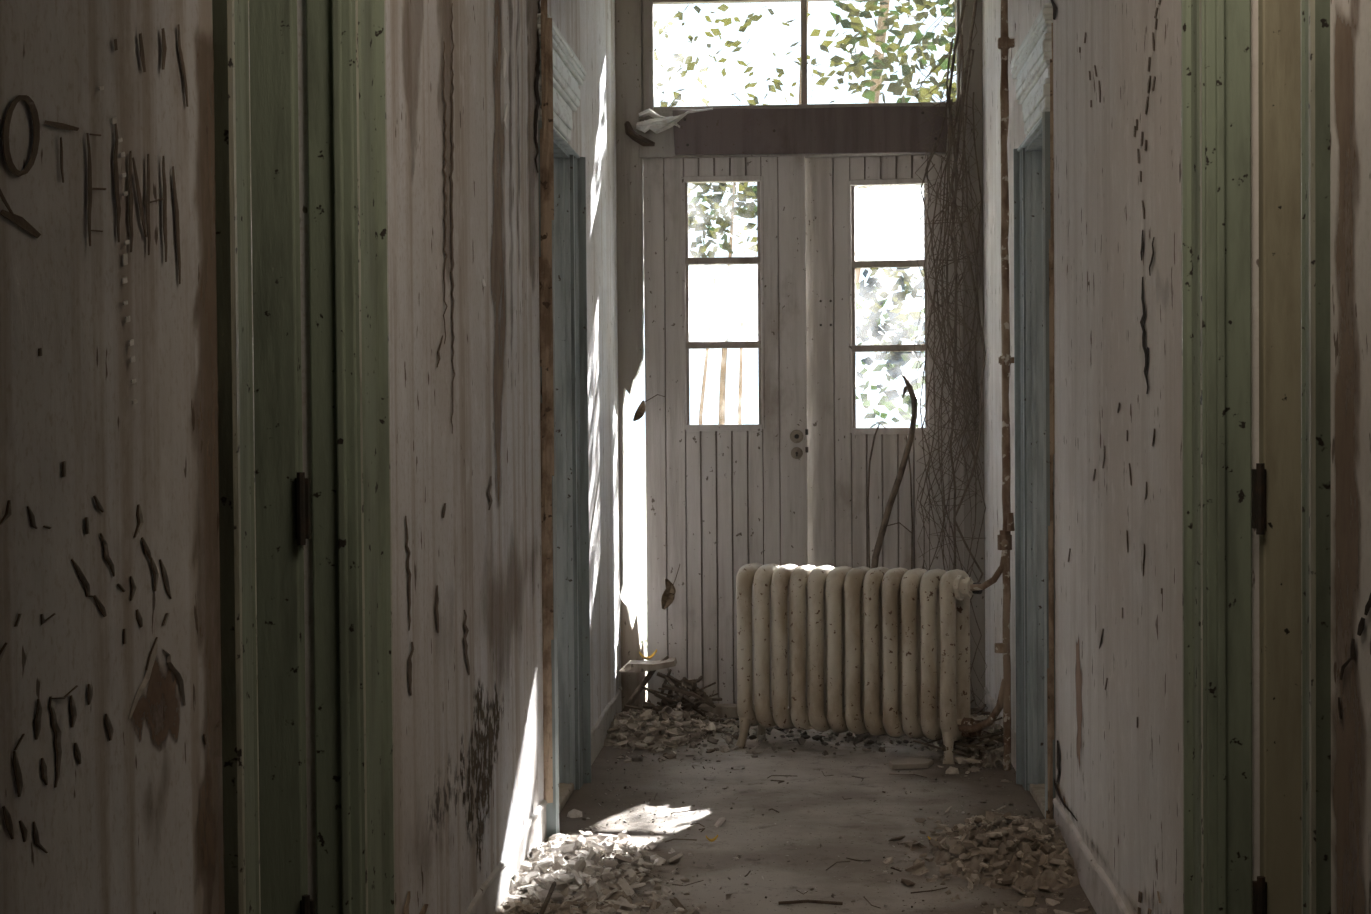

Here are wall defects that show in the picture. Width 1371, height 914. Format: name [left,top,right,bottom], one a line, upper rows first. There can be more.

peeling [1134,0,1161,182]
peeling [0,500,52,529]
peeling [71,559,107,617]
peeling [84,496,143,644]
flaking render [128,504,186,748]
peeling [2,684,93,853]